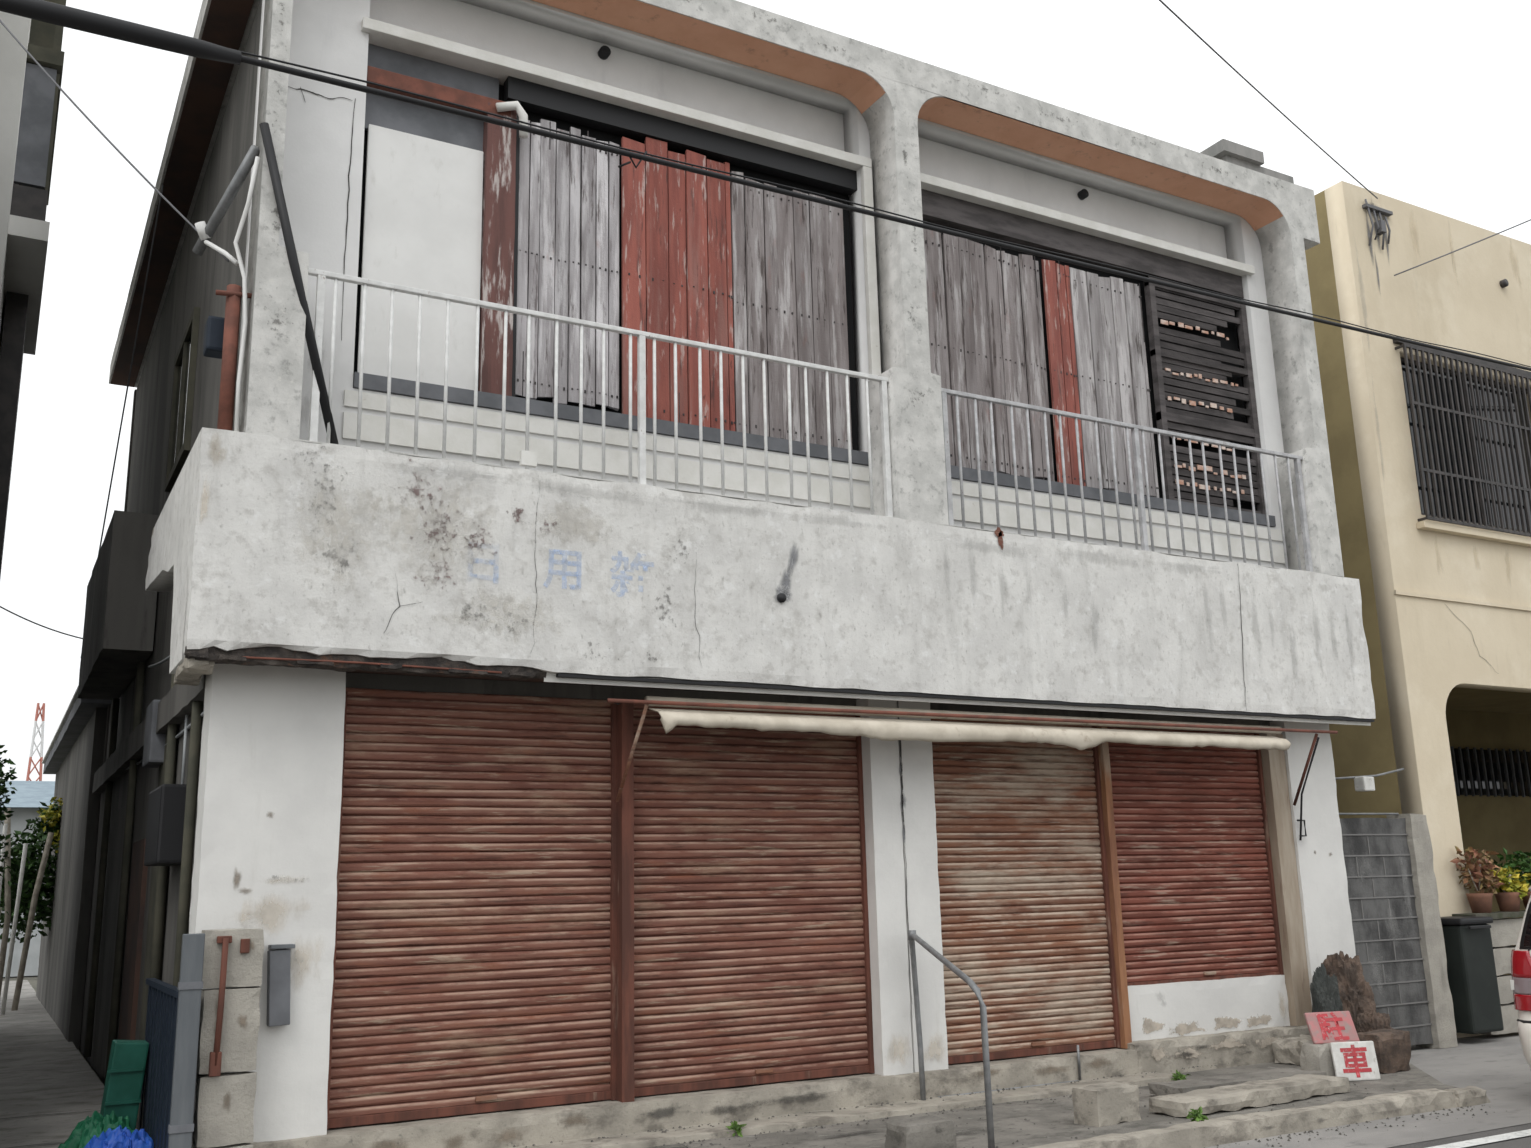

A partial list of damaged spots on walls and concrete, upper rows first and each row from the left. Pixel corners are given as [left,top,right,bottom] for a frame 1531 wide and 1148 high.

spalling [174,646,547,686]